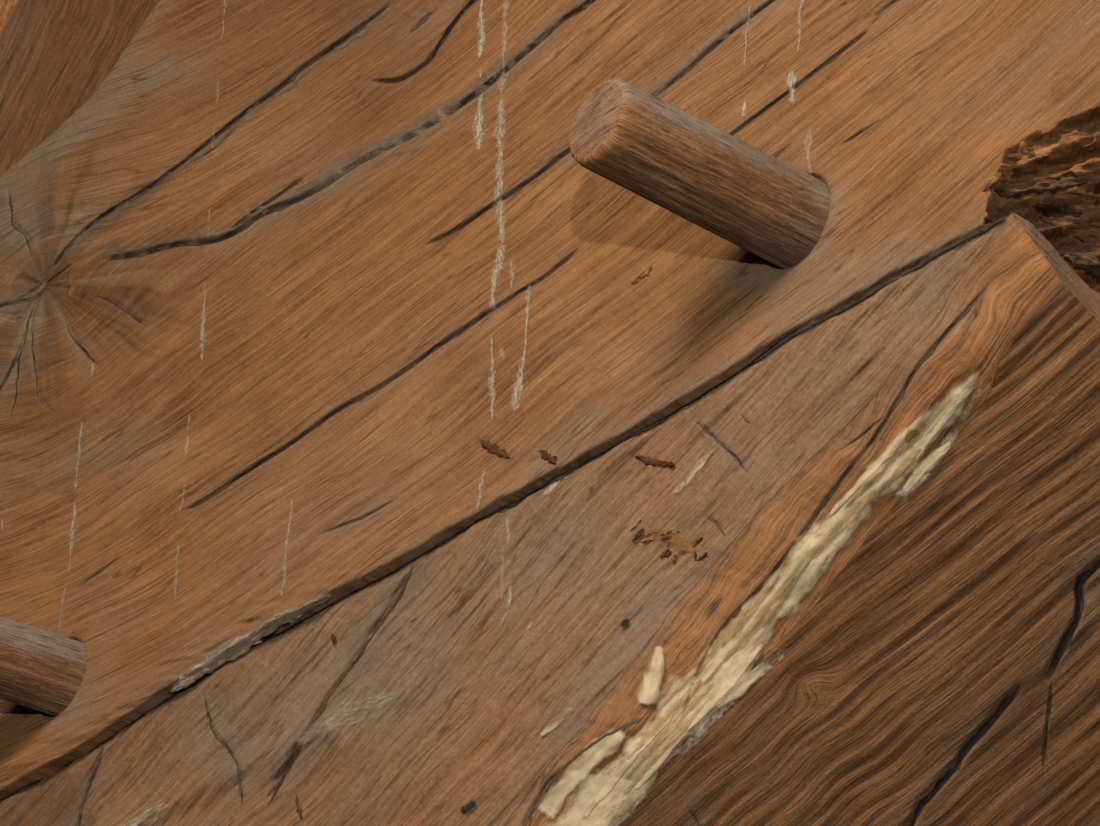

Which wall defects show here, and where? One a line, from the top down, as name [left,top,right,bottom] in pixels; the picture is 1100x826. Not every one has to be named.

crack [0,0,595,414]
crack [199,268,556,505]
water stain [474,94,505,306]
water stain [513,288,530,407]
crack [732,41,857,136]
crack [696,291,984,676]
peeling [982,128,1100,235]
peeling [1062,252,1100,286]
crack [204,566,412,826]
peeling [525,375,974,826]
crack [909,686,1020,826]
crack [1042,560,1100,772]